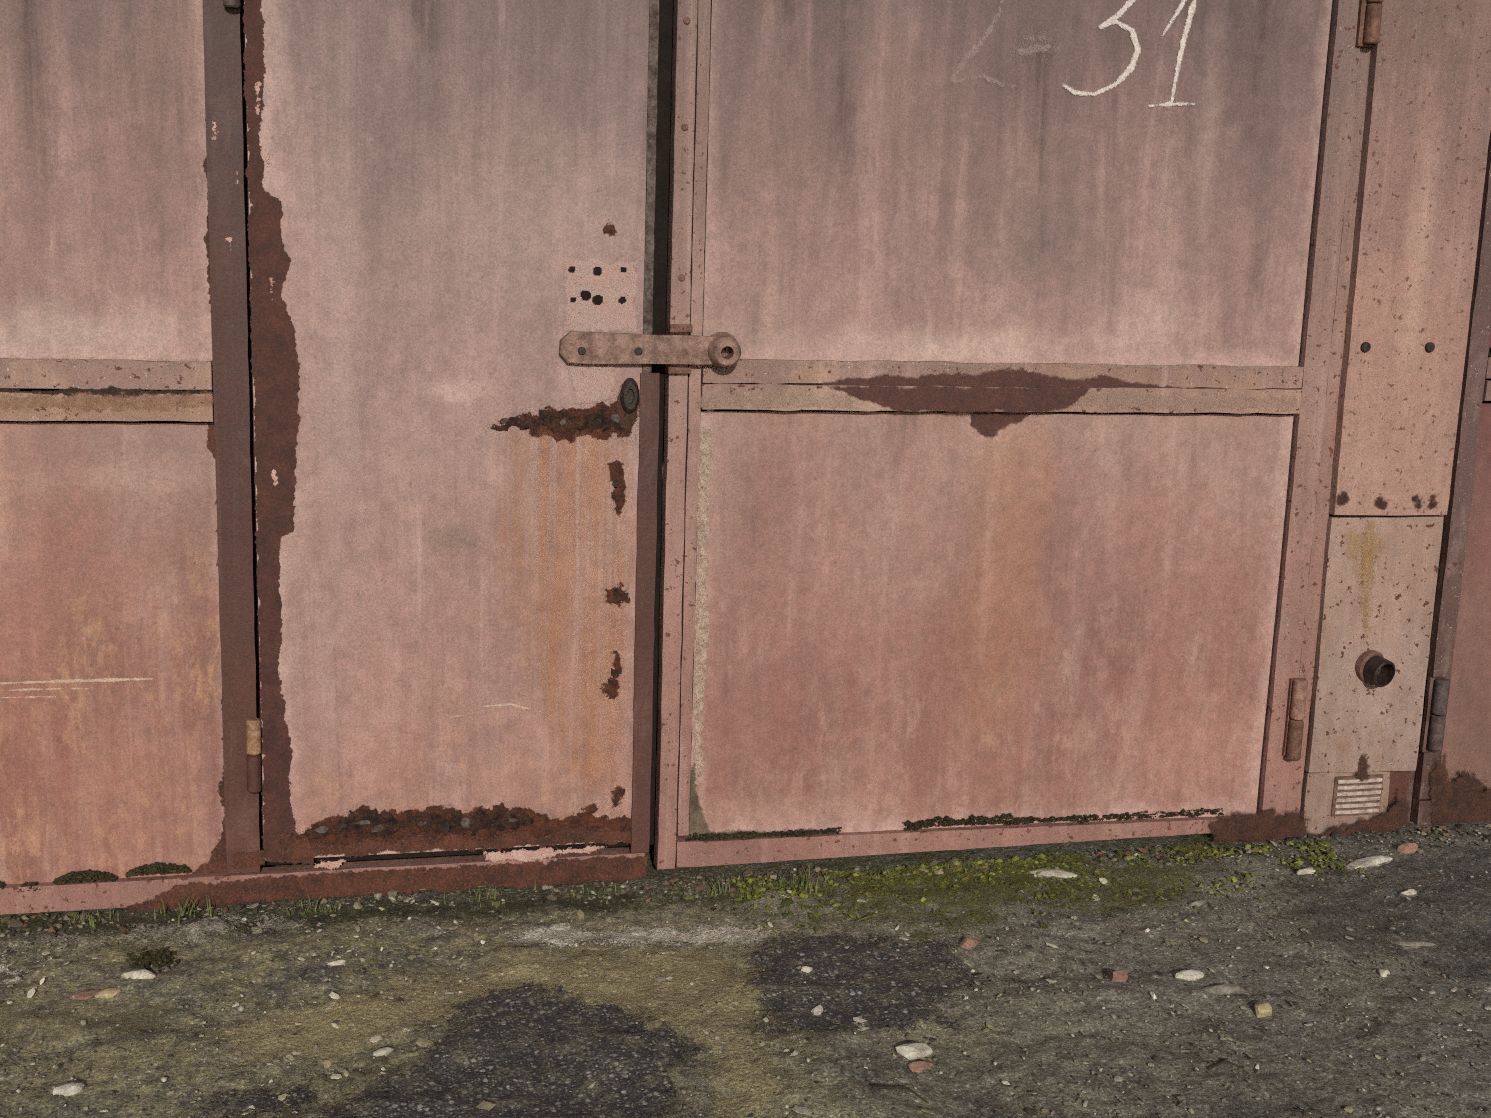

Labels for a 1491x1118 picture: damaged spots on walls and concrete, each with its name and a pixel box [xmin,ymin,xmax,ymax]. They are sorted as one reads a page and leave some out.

rust [491,394,640,443]
rust [290,802,631,846]